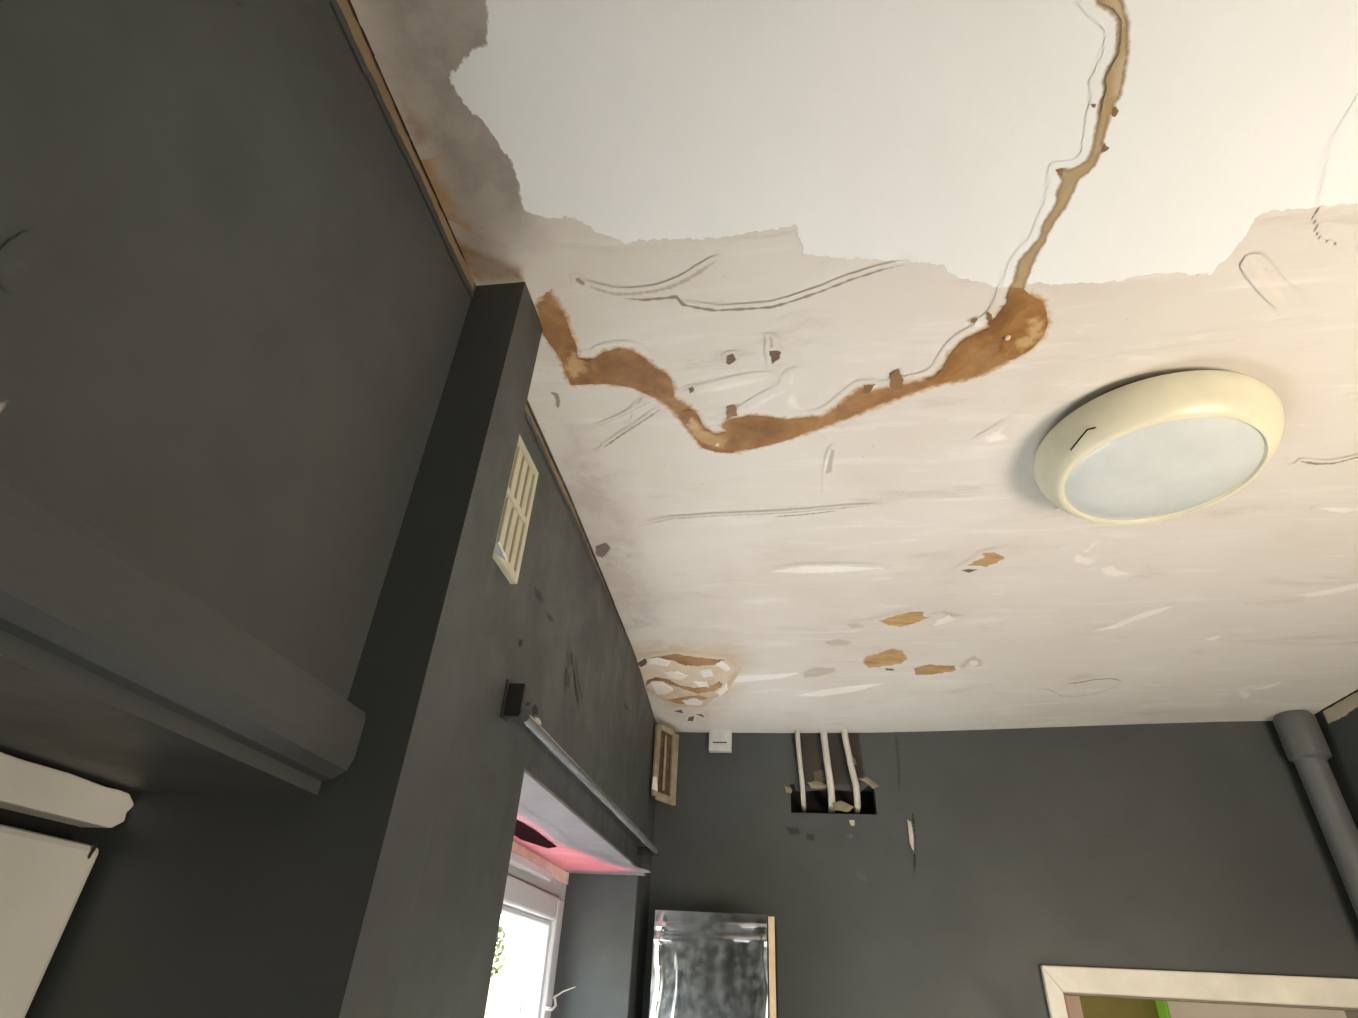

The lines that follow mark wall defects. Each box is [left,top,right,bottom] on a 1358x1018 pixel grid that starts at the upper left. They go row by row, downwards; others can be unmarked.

water stain [350,0,1143,630]
spalling [721,351,740,368]
spalling [764,333,786,367]
spalling [685,384,698,396]
spalling [595,543,611,557]
peeling [953,549,1012,576]
peeling [873,608,972,630]
peeling [818,636,989,678]
flaking render [626,627,841,732]
peeling [1320,689,1358,729]
flaking render [783,733,879,845]